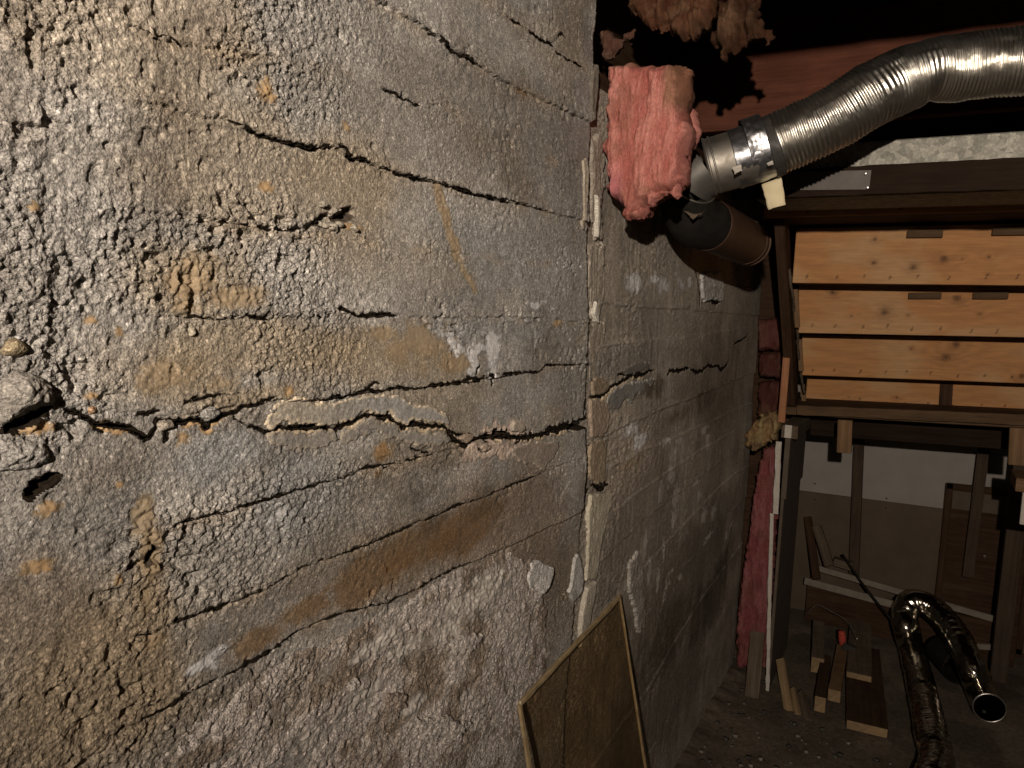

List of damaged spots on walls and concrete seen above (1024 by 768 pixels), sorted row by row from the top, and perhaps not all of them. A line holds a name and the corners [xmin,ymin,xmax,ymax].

crack [413,20,478,65]
crack [509,18,582,67]
crack [228,119,548,211]
crack [212,217,319,232]
water stain [372,326,503,379]
spalling [0,406,53,435]
flaking render [264,394,526,464]
crack [59,333,748,521]
spalling [22,472,62,503]
crack [136,473,541,636]
peeling [527,560,554,594]
crack [143,630,298,719]